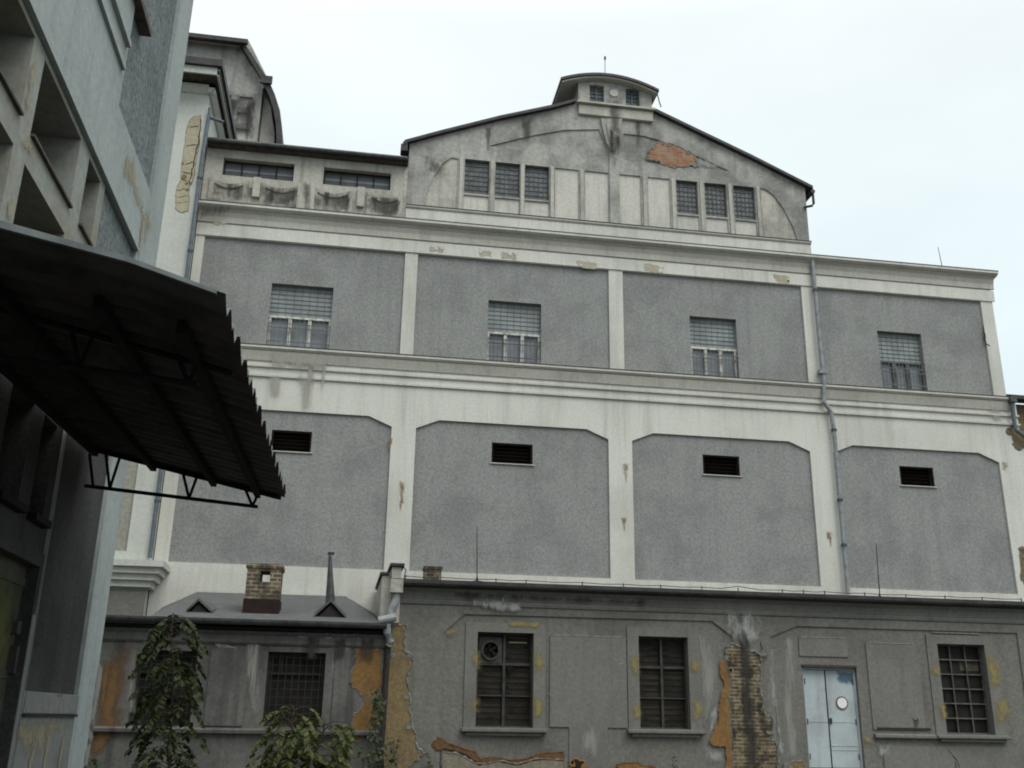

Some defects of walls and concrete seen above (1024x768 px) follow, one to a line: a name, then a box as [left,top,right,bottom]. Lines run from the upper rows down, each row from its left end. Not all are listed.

peeling [175,115,202,213]
flaking render [645,141,698,170]
peeling [349,623,587,768]
water stain [728,614,757,768]
flaking render [709,642,806,768]